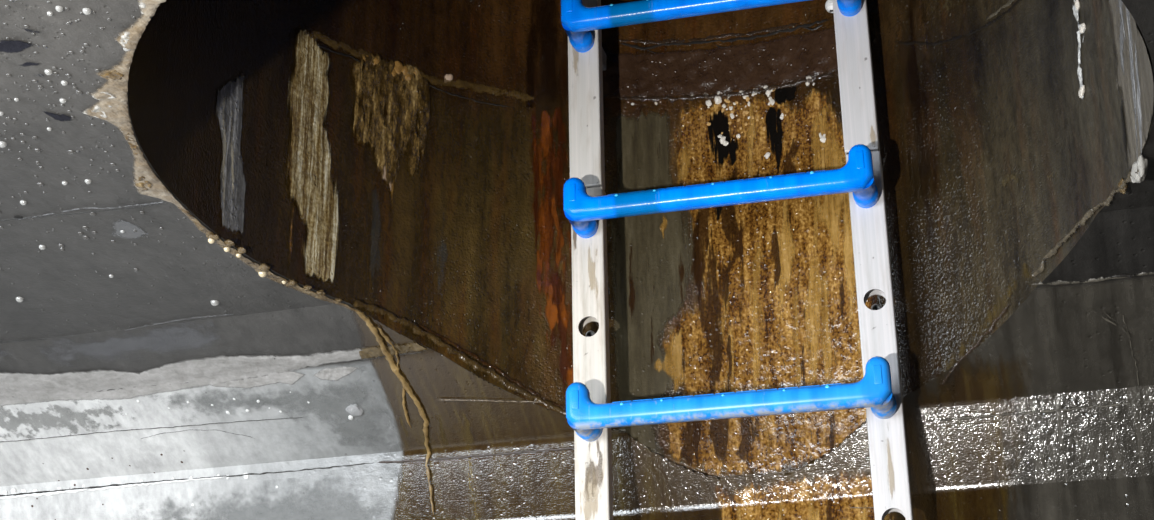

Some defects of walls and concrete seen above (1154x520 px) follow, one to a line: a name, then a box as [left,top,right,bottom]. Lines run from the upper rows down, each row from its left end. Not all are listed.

damp [84,0,575,520]
corrosion [531,108,573,395]
damp [611,0,1154,520]